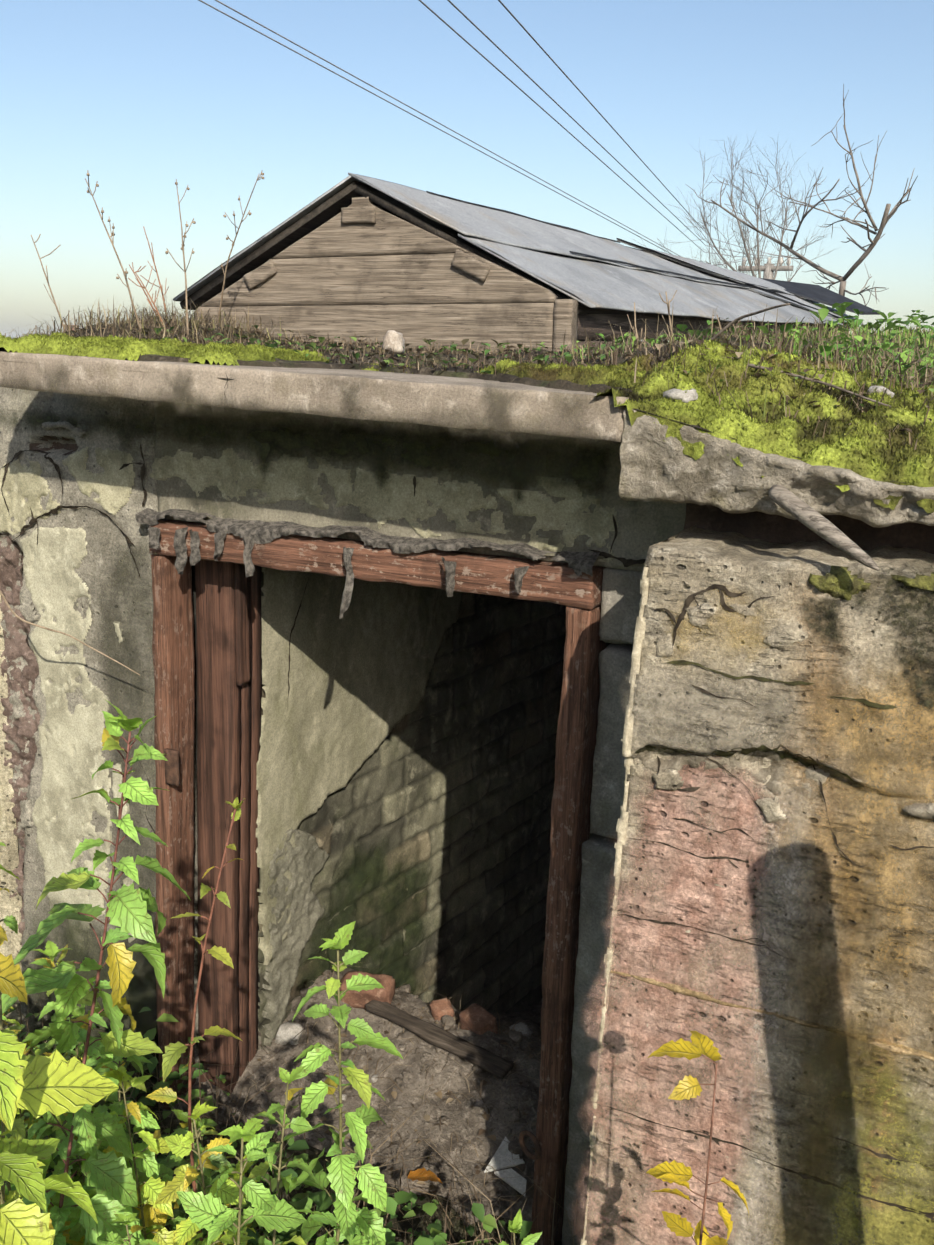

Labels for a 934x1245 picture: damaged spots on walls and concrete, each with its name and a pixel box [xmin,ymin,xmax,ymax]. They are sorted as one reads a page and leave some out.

leakage [449,388,511,433]
crack [0,450,140,576]
crack [119,444,147,507]
peeling [0,422,618,962]
crack [654,584,897,710]
crack [629,744,933,869]
leakage [834,694,934,989]
flaking render [258,828,330,1050]
spalling [340,971,395,1009]
spalling [430,997,498,1035]